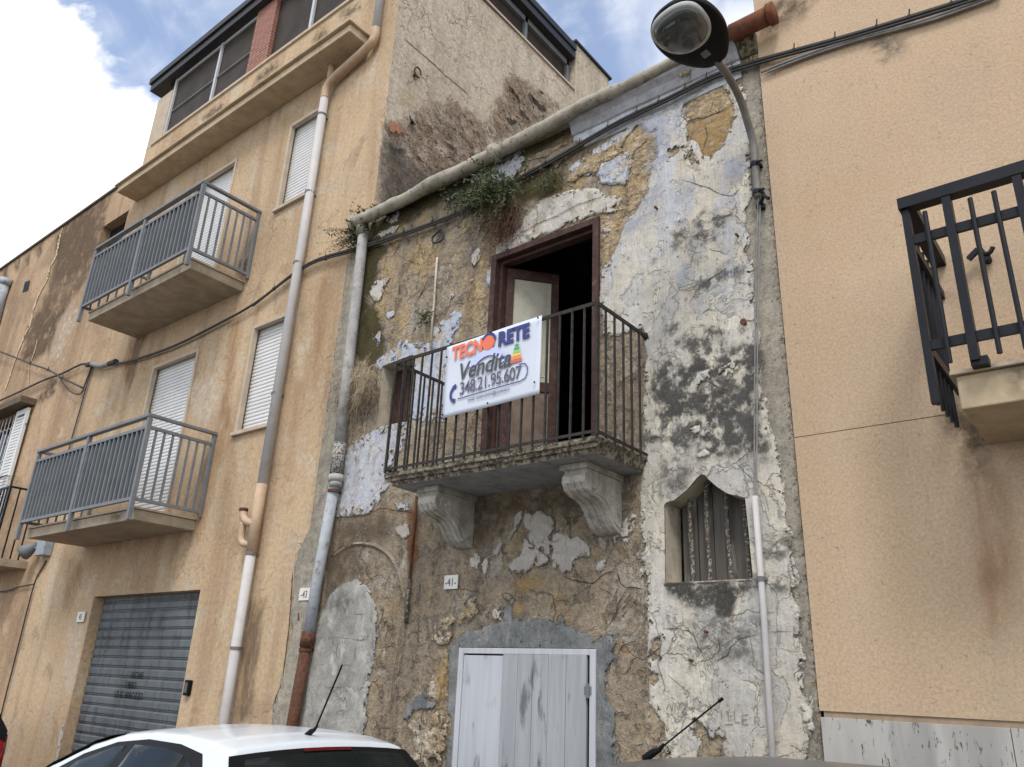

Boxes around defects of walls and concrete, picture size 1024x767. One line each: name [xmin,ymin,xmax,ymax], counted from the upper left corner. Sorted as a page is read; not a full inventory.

damp [380,139,451,200]
flaking render [447,86,735,266]
peeling [375,211,399,238]
crack [5,228,63,389]
damp [25,199,107,359]
peeling [369,277,390,302]
damp [642,324,769,455]
peeling [687,360,739,395]
peeling [470,510,606,575]
crack [663,609,801,689]
flaking render [644,705,671,759]
flaking render [694,721,727,757]